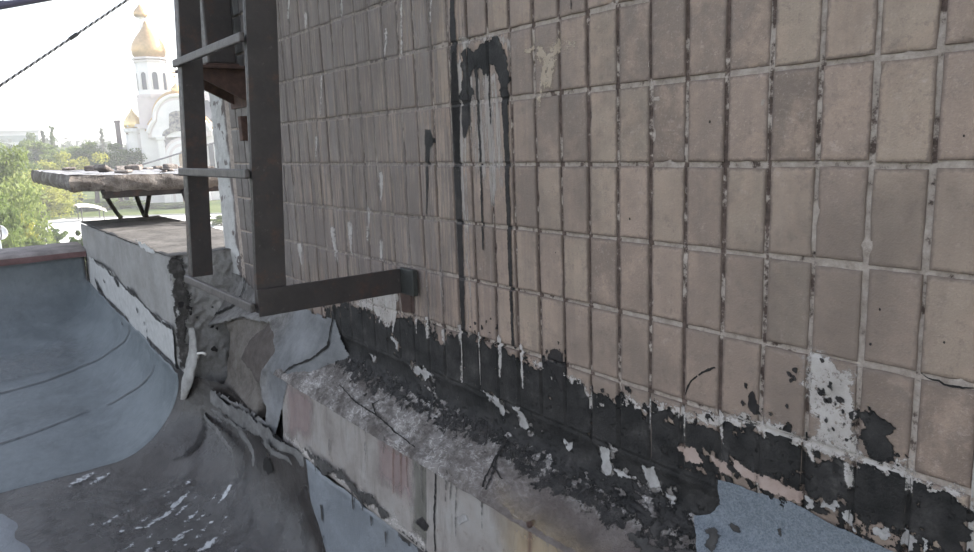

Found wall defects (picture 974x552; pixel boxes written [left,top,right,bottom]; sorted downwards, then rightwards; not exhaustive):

damp [323,0,974,552]
spalling [167,257,199,375]
crack [283,304,334,373]
crack [339,384,415,447]
crack [685,367,715,395]
spalling [787,350,861,455]
peeling [136,481,226,552]
peeling [283,432,429,547]
crack [482,438,506,487]